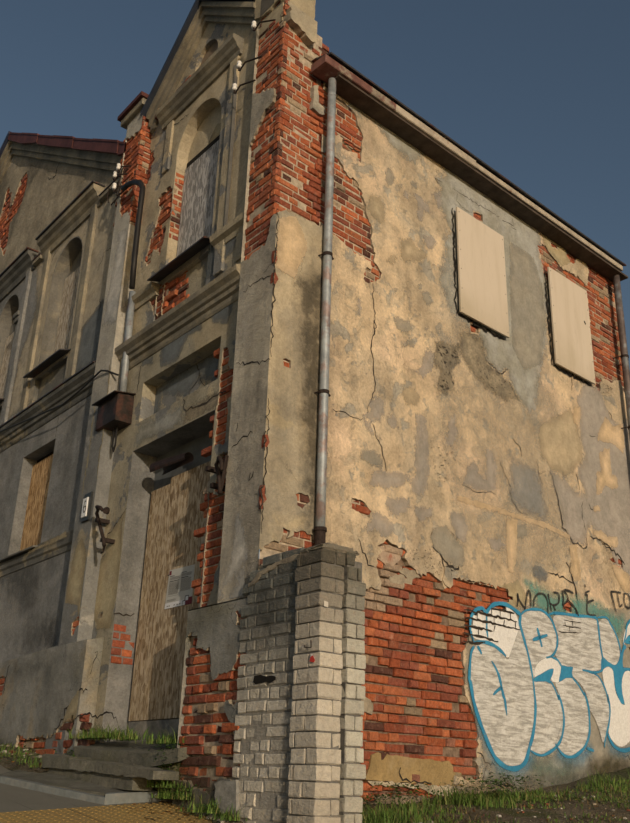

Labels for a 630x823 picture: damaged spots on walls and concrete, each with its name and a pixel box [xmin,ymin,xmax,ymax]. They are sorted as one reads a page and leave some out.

flaking render [0,172,28,256]
peeling [8,125,155,419]
flaking render [145,172,184,266]
flaking render [150,271,190,320]
flaking render [225,0,424,285]
crack [183,364,226,412]
crack [333,287,387,471]
flaking render [136,347,234,608]
flaking render [351,166,630,804]
crack [462,465,527,515]
crack [513,439,593,601]
flaking render [179,632,246,794]